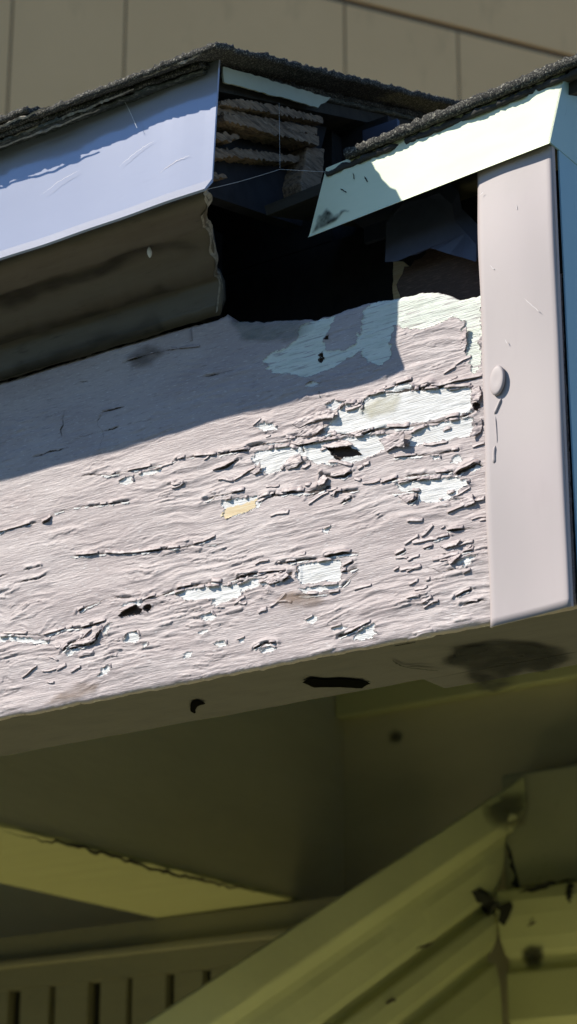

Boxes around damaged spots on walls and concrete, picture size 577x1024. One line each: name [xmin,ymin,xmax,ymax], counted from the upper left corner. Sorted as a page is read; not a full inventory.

peeling [250,293,483,507]
peeling [220,495,265,519]
peeling [440,539,476,568]
peeling [118,599,143,611]
peeling [174,558,342,648]
peeling [0,633,50,645]
peeling [65,621,112,657]
peeling [123,629,149,648]
peeling [331,623,378,641]
leakage [446,643,566,691]
spalling [303,678,370,688]
crack [2,830,262,892]